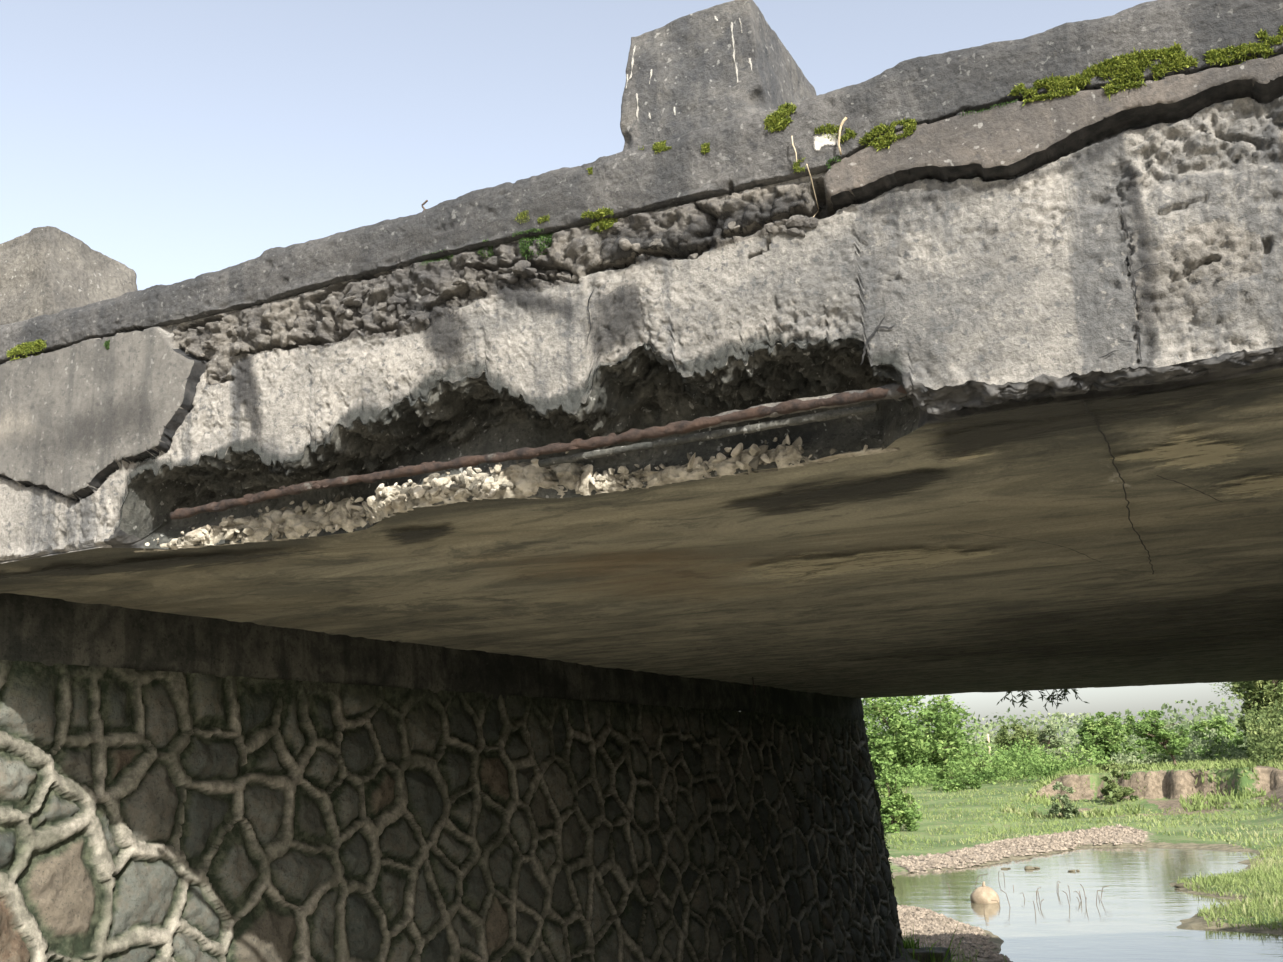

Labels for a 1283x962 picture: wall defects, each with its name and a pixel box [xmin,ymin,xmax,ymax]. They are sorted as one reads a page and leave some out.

crack [831,54,1283,212]
crack [0,326,146,365]
spalling [0,54,1283,552]
crack [0,348,209,502]
water stain [724,376,1283,516]
crack [1084,402,1154,574]